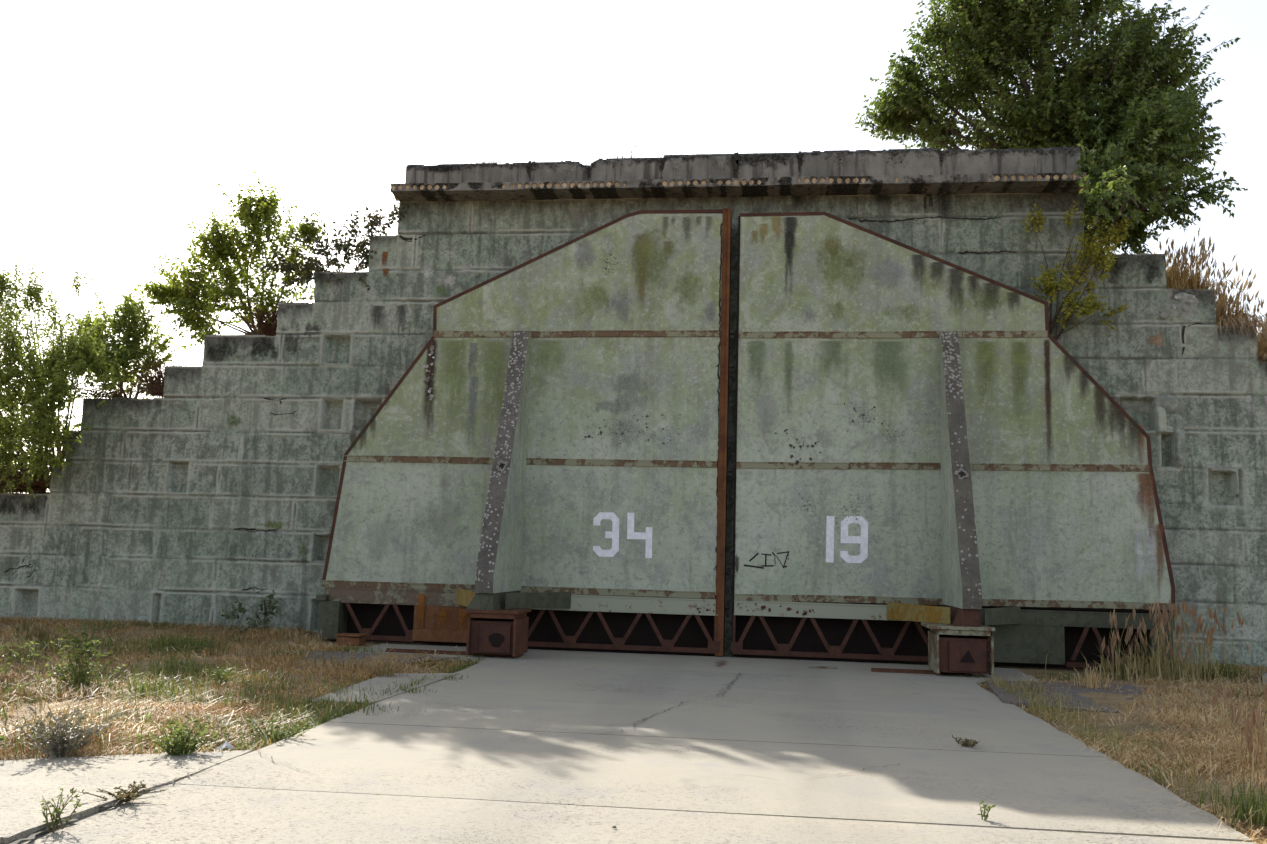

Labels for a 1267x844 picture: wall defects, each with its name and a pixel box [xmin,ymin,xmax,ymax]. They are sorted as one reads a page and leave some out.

damp [786,195,817,272]
damp [913,255,1019,306]
damp [424,340,436,420]
rust [1139,474,1163,574]
crack [7,766,211,844]